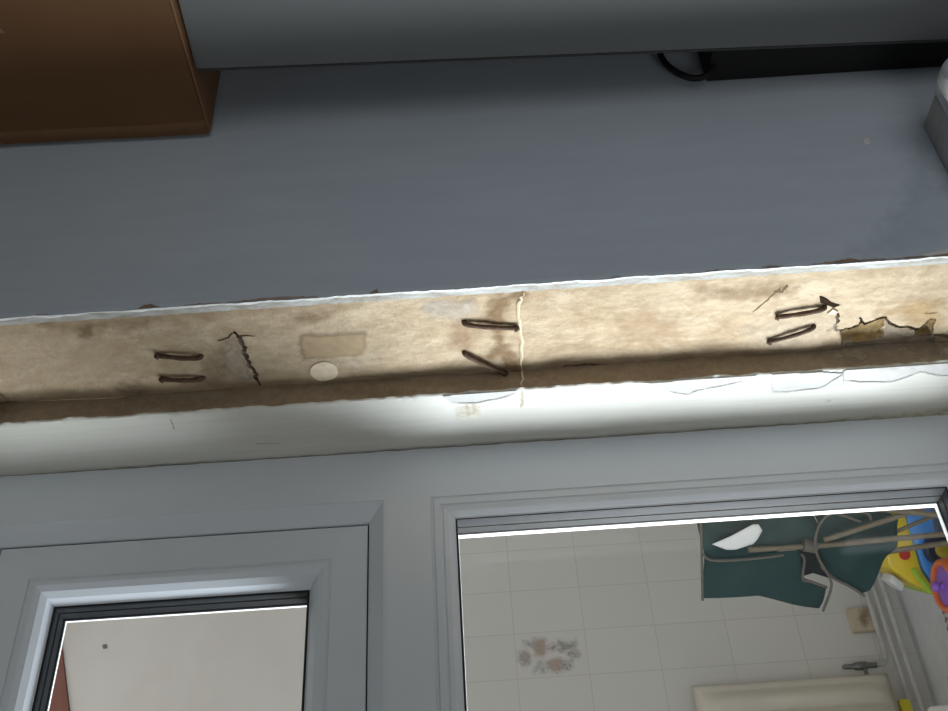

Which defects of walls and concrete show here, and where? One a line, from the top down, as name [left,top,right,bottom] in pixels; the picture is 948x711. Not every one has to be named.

peeling [0,249,948,321]
crack [218,331,261,386]
peeling [443,391,518,404]
corrosion [480,292,526,372]
peeling [649,376,759,395]
spalling [753,296,948,393]
crack [917,332,948,340]